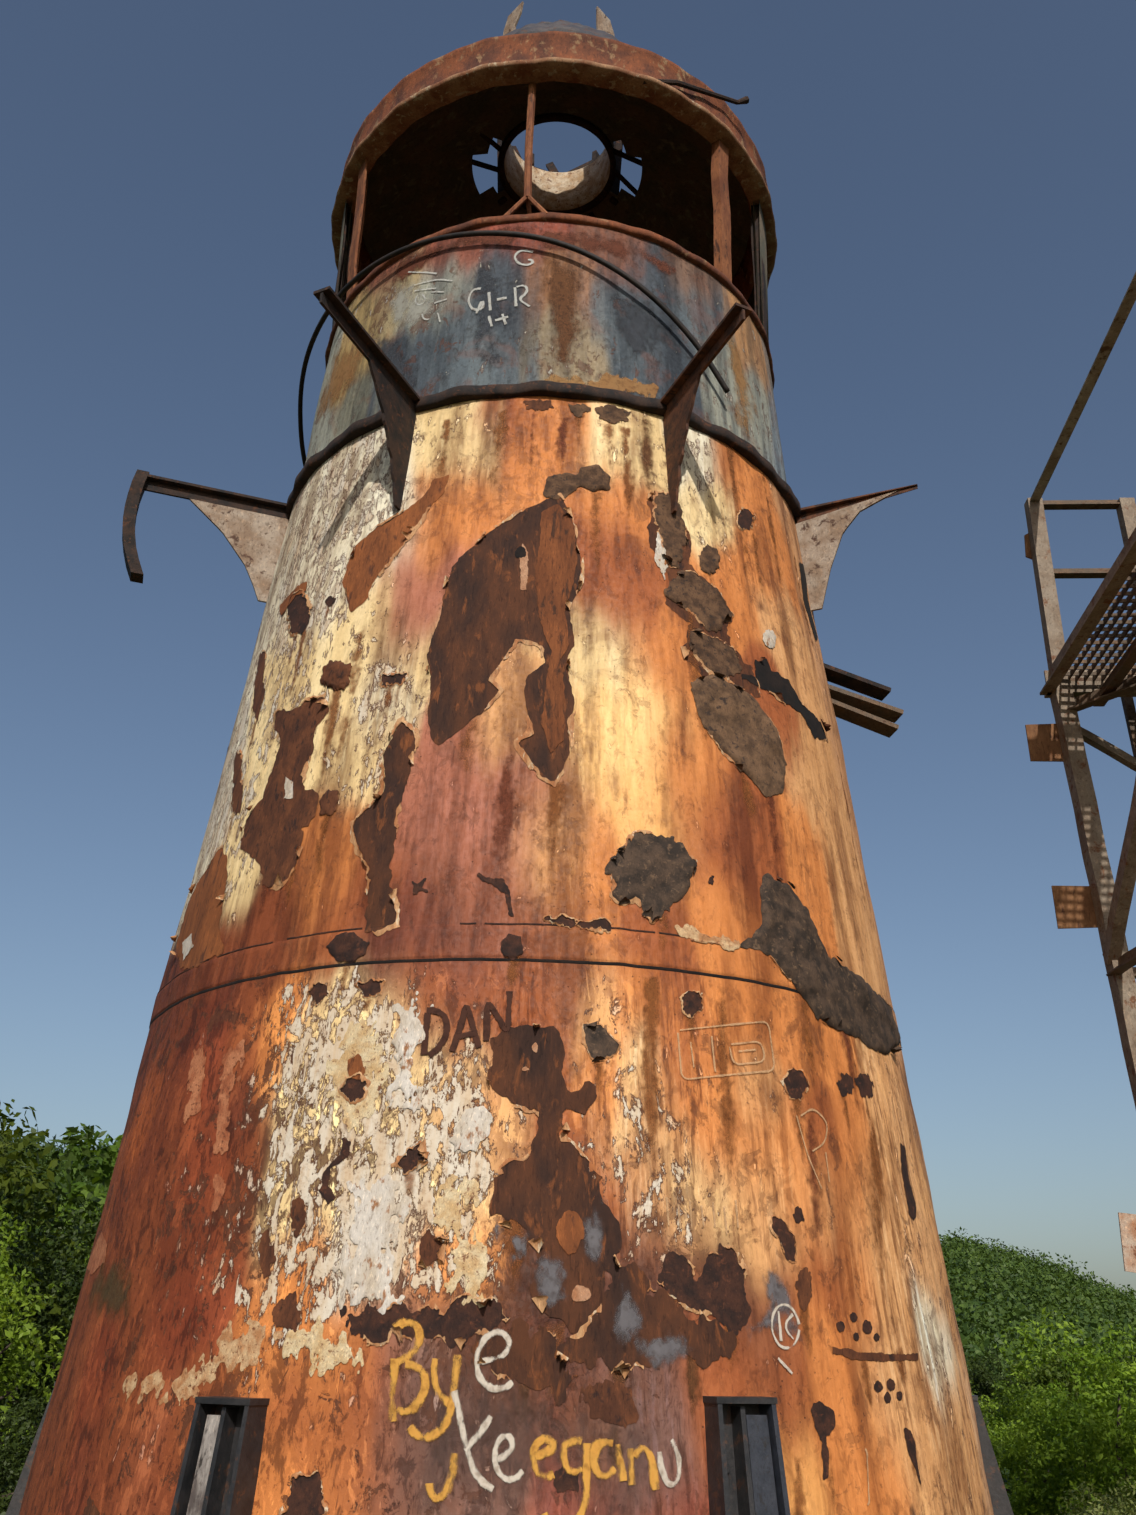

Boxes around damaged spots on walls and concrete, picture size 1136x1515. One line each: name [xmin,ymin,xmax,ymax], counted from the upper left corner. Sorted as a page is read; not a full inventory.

rust [395,227,675,398]
rust [621,420,653,503]
peeling [646,491,784,701]
peeling [350,493,585,936]
peeling [169,692,329,970]
spalling [307,981,329,1006]
peeling [326,977,434,1132]
rust [643,978,658,1142]
peeling [123,1023,752,1466]
rust [807,1122,819,1227]
rust [870,1127,884,1245]
rust [794,1465,804,1515]